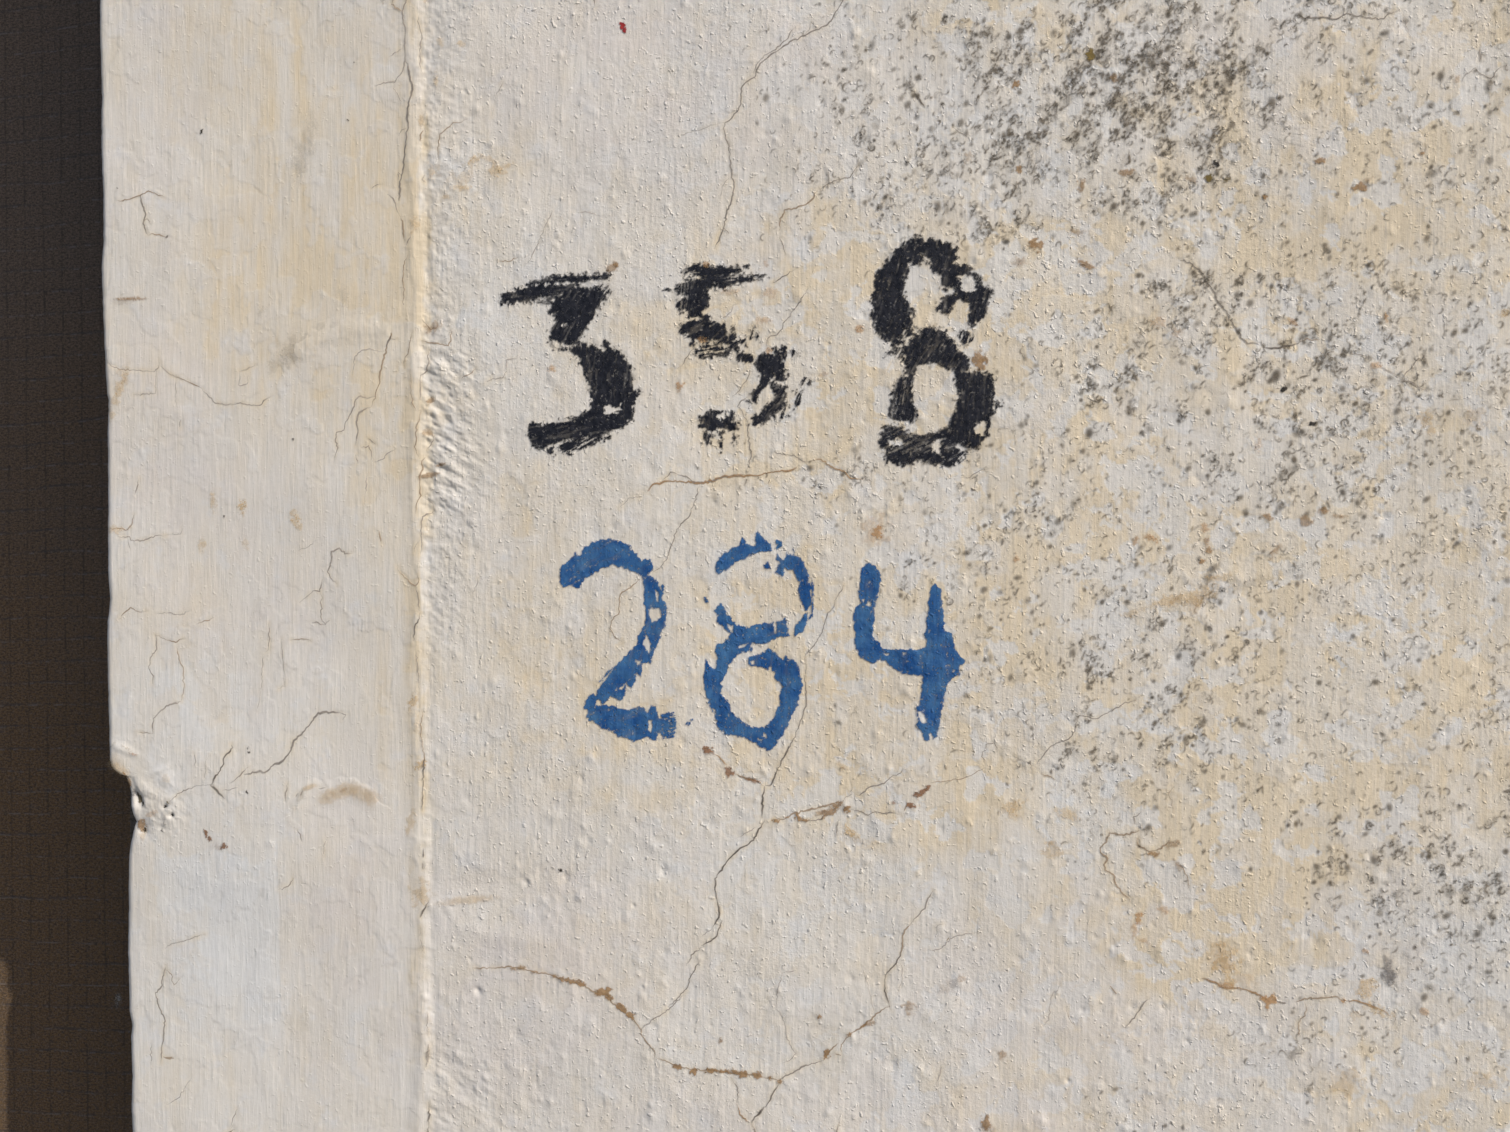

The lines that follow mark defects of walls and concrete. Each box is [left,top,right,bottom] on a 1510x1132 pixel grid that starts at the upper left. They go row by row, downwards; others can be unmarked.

crack [684,0,843,244]
leakage [852,0,1310,250]
crack [610,170,866,638]
leakage [1054,241,1431,518]
crack [121,607,210,733]
crack [175,711,346,797]
crack [258,533,381,705]
crack [936,701,1131,782]
leakage [1060,550,1150,727]
leakage [1050,612,1207,784]
crack [478,590,967,1132]
leakage [1367,794,1505,954]